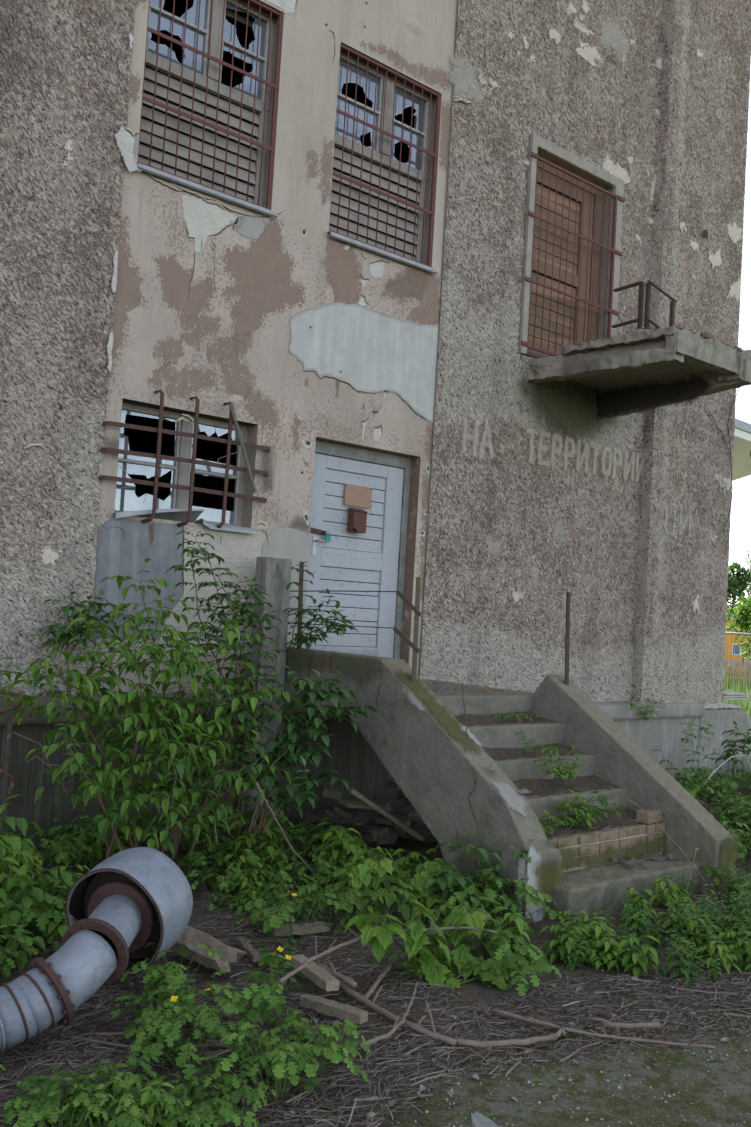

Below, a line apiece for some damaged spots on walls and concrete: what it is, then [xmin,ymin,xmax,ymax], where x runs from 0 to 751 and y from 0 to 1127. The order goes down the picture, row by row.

peeling [267,0,298,14]
flaking render [548,24,561,44]
peeling [563,0,638,66]
peeling [181,194,238,253]
peeling [359,258,390,306]
peeling [361,411,383,442]
spalling [487,766,529,816]